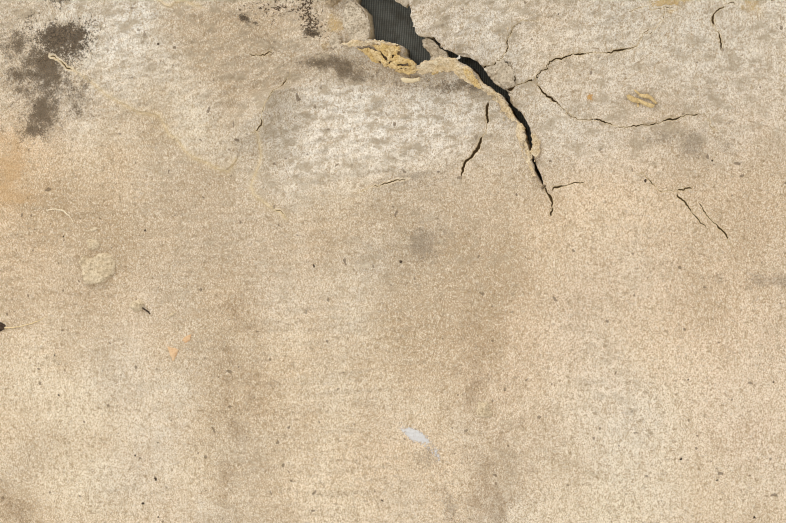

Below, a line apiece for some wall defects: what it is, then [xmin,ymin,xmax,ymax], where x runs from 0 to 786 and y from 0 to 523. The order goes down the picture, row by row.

water stain [4,14,101,140]
crack [48,52,77,74]
flaking render [50,0,485,226]
crack [246,48,293,138]
crack [325,0,740,220]
flaking render [409,0,740,189]
crack [625,167,740,257]